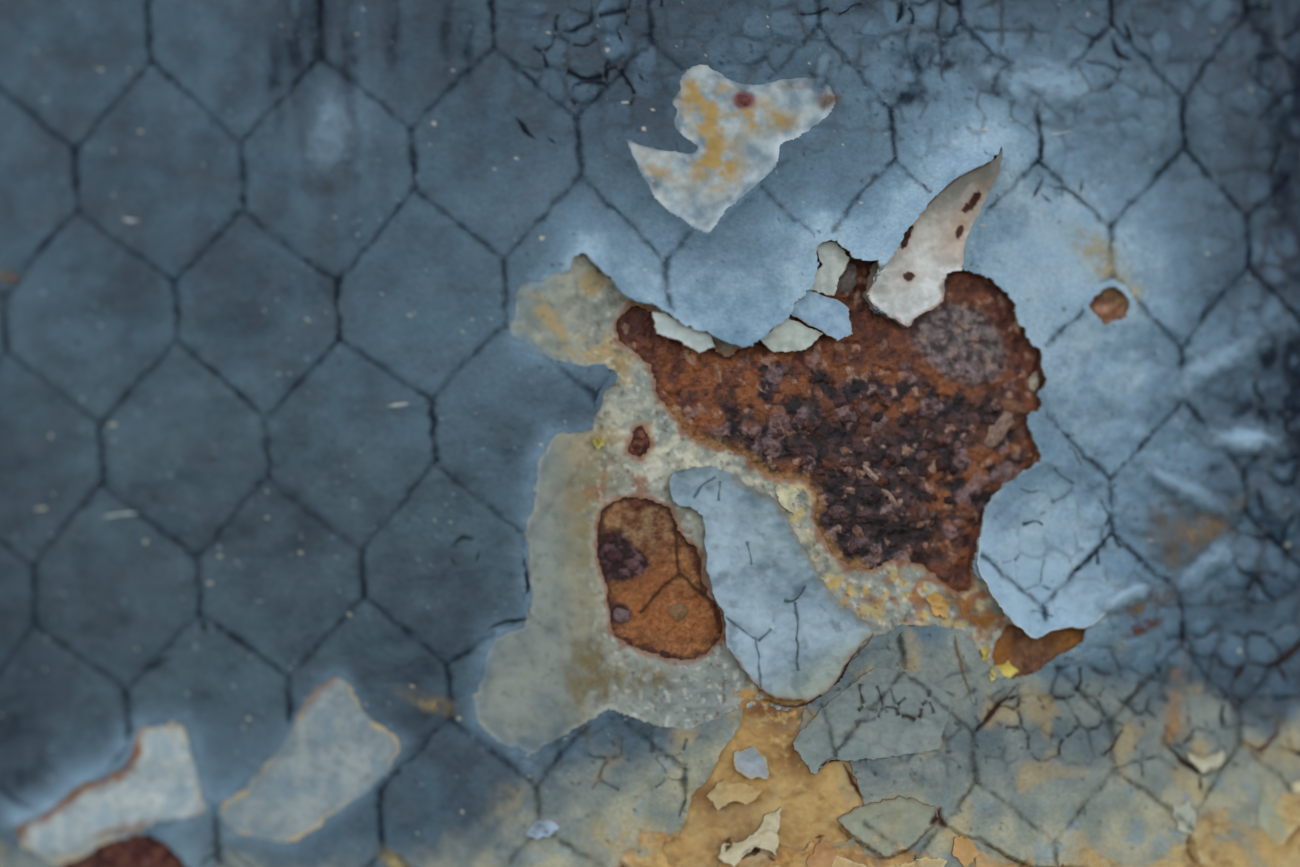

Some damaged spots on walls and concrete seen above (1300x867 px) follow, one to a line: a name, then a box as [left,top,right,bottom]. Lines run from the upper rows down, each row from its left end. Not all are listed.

crack [536,9,643,105]
peeling [627,65,835,233]
peeling [863,147,1003,328]
corrosion [1089,266,1135,325]
corrosion [616,240,1085,679]
peeling [472,241,1116,867]
crack [1015,507,1121,589]
peeling [13,677,400,864]
crack [720,586,935,722]
crack [954,632,1300,790]
peeling [1187,750,1225,774]
corrosion [63,835,185,867]